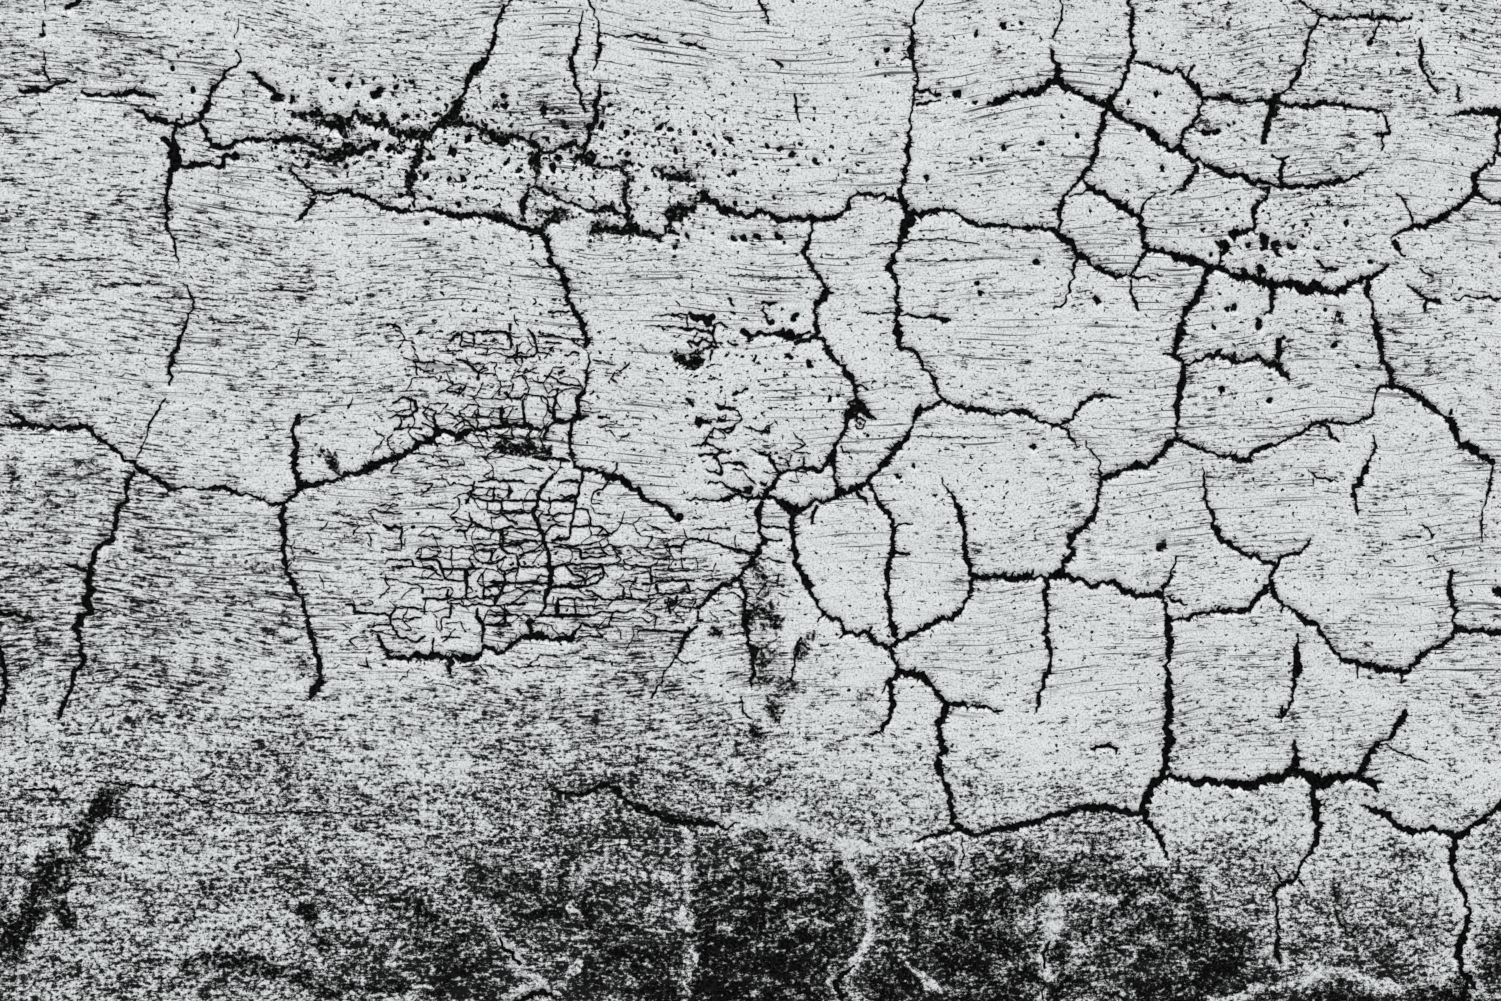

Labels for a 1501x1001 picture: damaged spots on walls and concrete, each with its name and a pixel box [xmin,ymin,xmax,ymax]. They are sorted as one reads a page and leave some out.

crack [18,0,304,261]
crack [449,0,522,120]
crack [566,0,707,156]
crack [165,283,196,386]
crack [288,168,593,357]
crack [671,311,729,361]
crack [0,328,790,720]
crack [686,0,1501,965]
crack [544,782,741,832]
crack [496,937,558,1001]
crack [1040,941,1051,1000]
crack [1360,799,1501,1001]